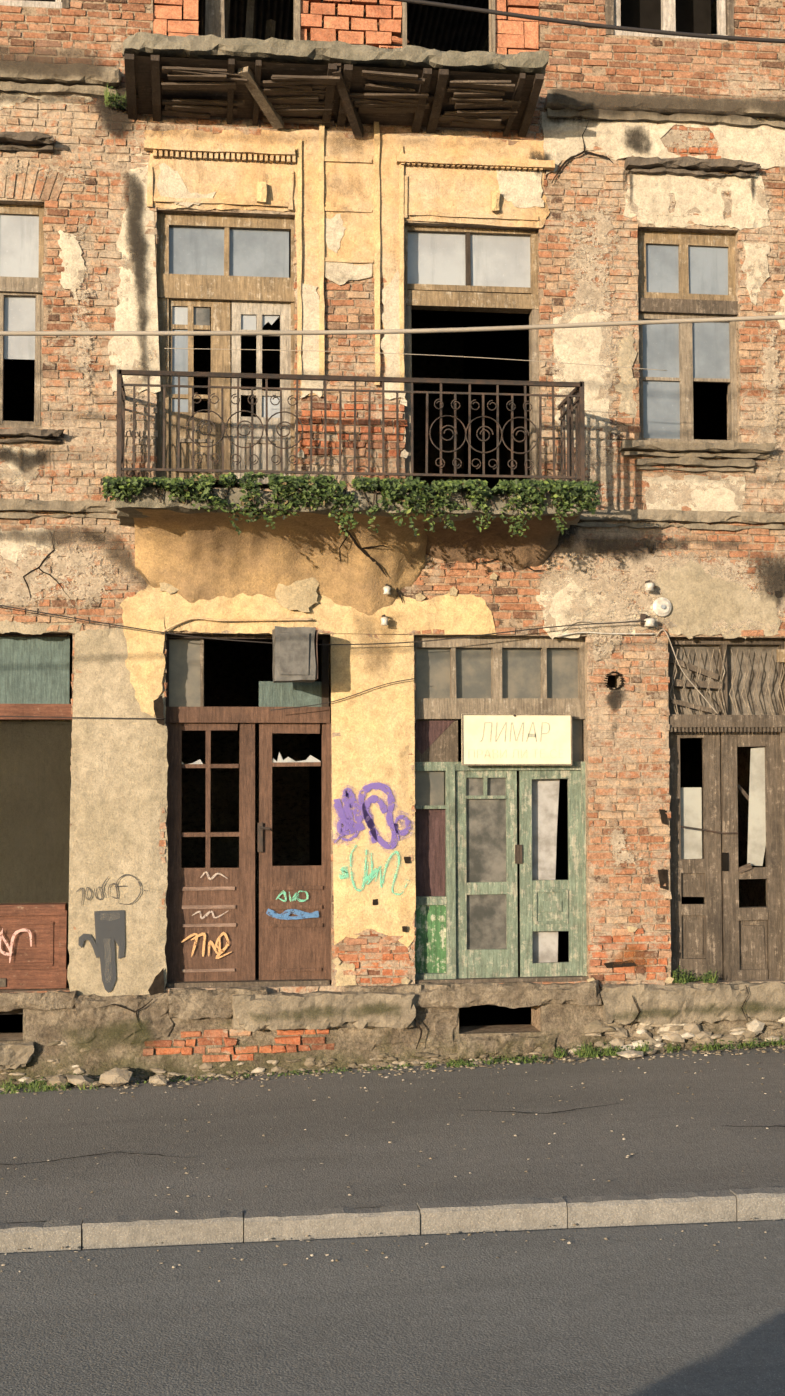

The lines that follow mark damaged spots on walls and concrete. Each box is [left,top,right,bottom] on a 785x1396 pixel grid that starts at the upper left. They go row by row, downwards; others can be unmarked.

spalling [538,110,785,231]
water stain [124,174,148,381]
water stain [566,170,632,508]
water stain [753,323,784,489]
crack [23,545,65,598]
crack [337,524,403,603]
water stain [546,525,785,673]
spalling [604,671,625,690]
water stain [606,813,648,876]
spalling [331,926,410,984]
spalling [587,926,674,983]
spalling [143,1028,335,1062]